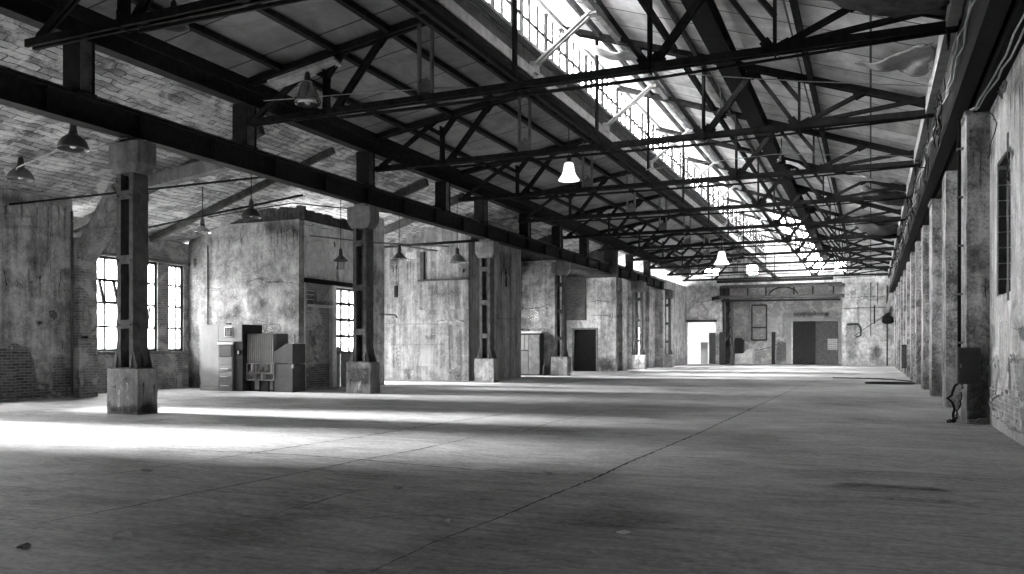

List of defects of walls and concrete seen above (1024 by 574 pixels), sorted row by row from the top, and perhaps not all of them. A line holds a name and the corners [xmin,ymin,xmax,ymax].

spalling [0,342,73,402]
spalling [967,326,1024,435]